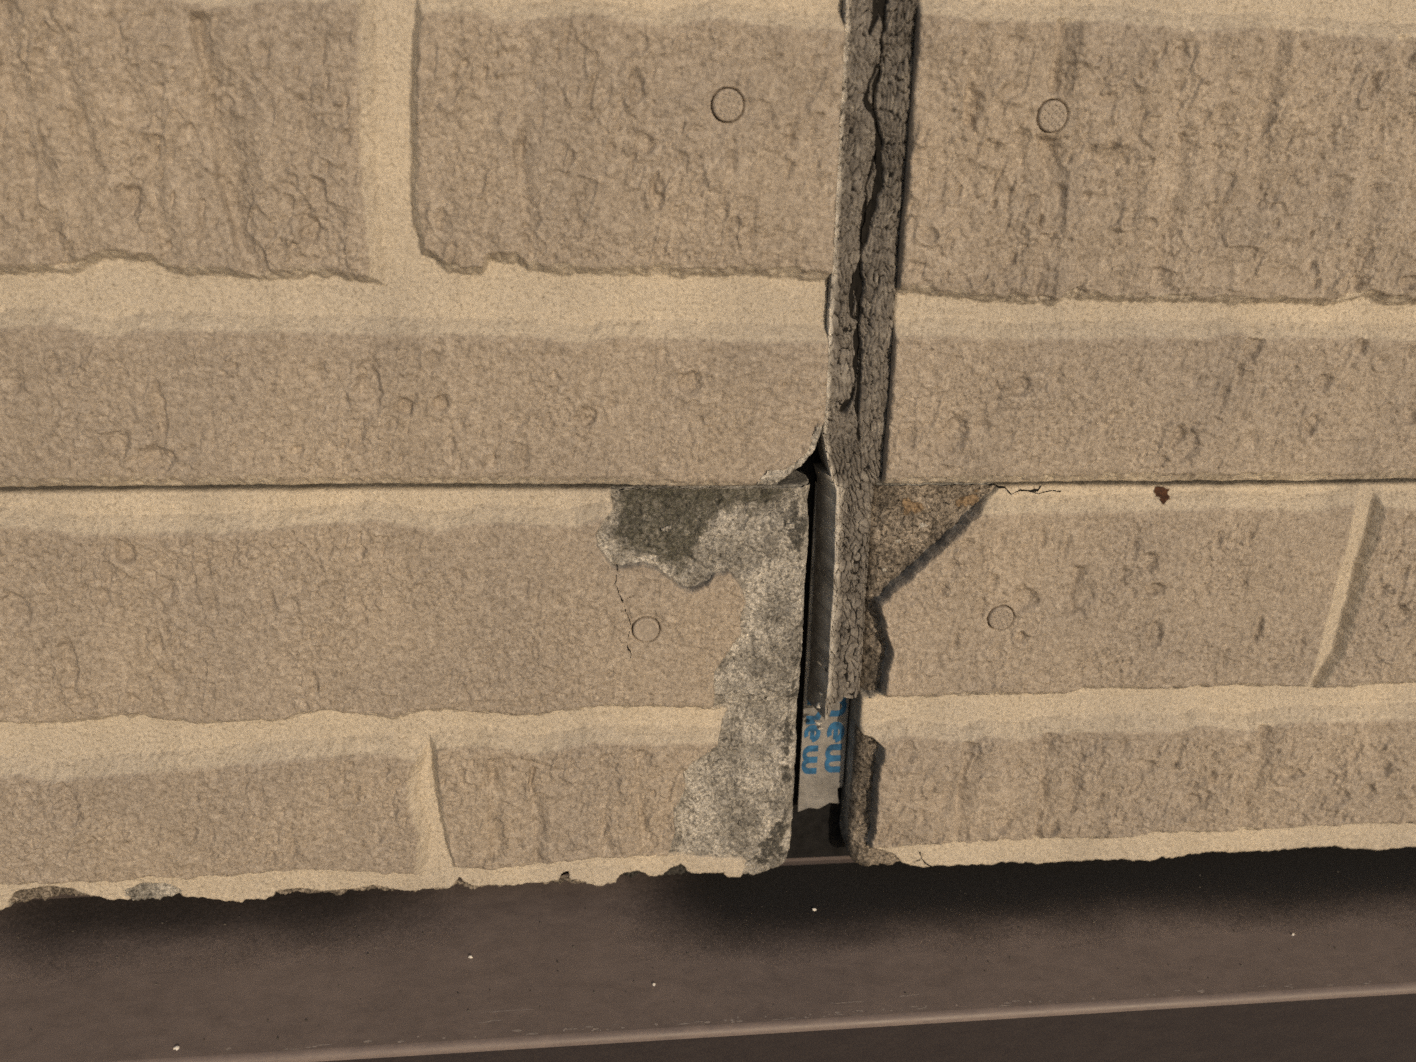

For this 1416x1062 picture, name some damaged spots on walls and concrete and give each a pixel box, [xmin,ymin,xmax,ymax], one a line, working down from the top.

spalling [596,426,823,878]
crack [823,0,917,712]
spalling [860,484,996,690]
corrosion [1154,486,1170,504]